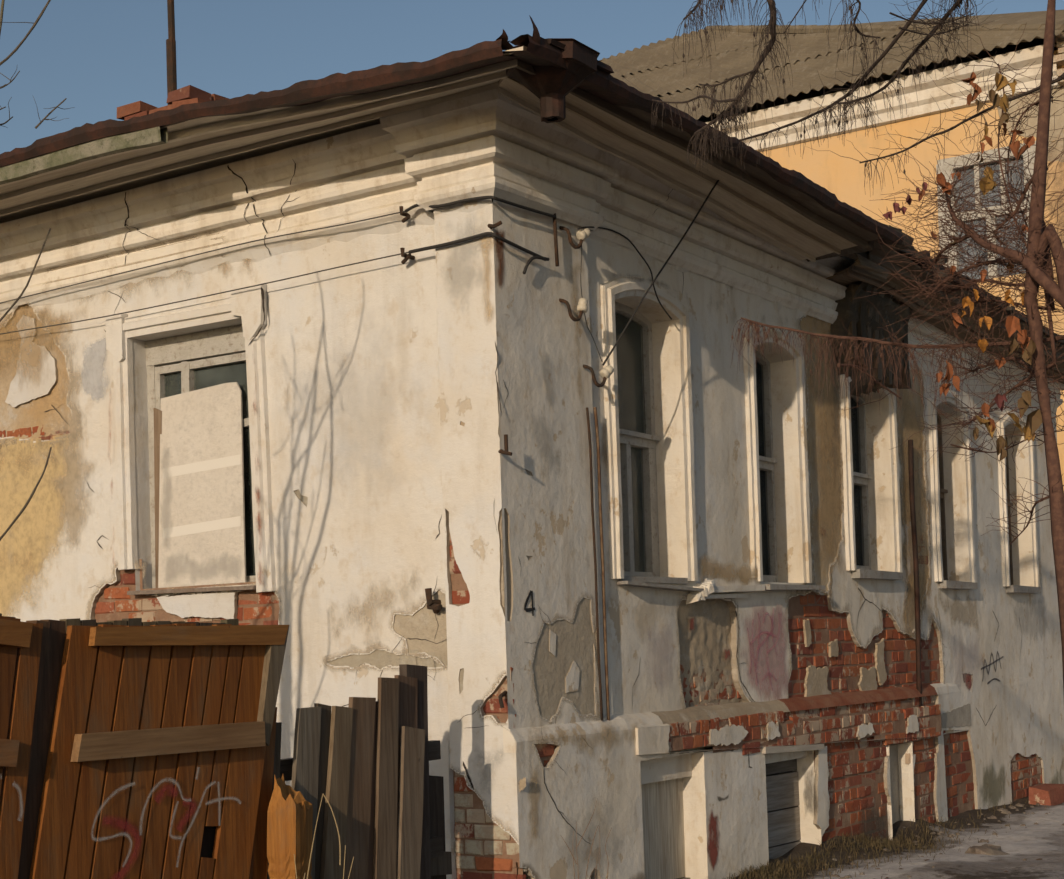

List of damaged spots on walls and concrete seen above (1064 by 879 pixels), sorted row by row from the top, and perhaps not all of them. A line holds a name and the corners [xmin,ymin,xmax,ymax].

crack [123,192,158,261]
crack [227,160,299,254]
rust [495,231,504,286]
peeling [0,303,79,446]
spalling [87,559,280,625]
peeling [324,530,470,677]
spalling [665,315,975,842]
spalling [459,667,516,724]
peeling [525,597,599,844]
spalling [453,762,537,879]
spalling [1010,753,1064,806]